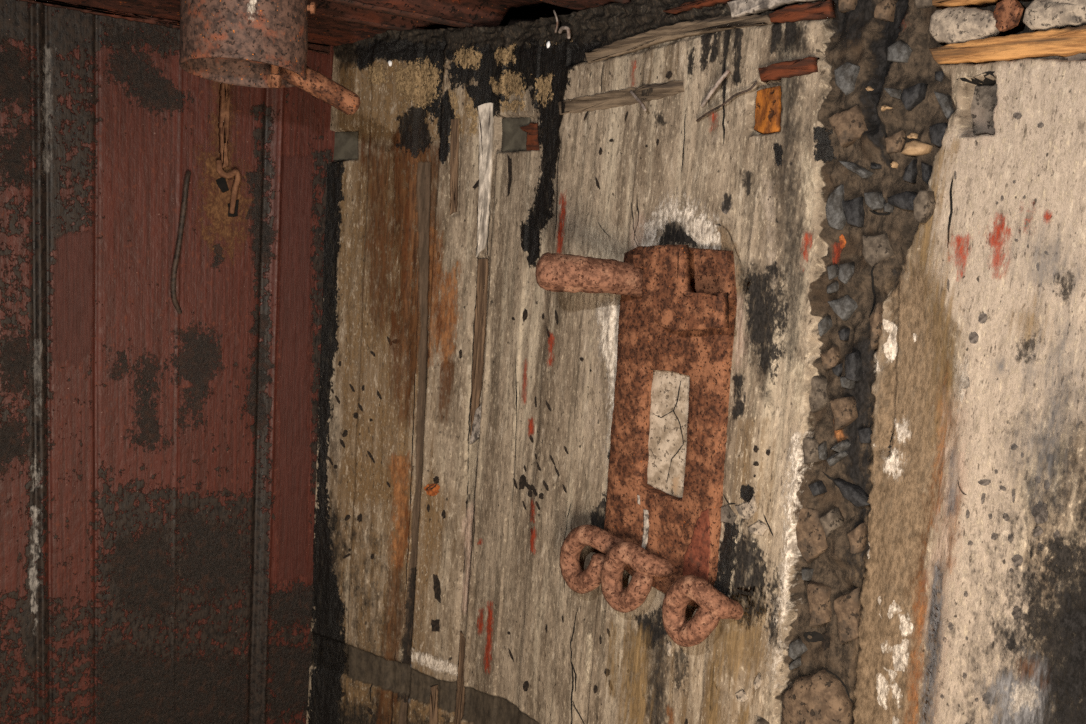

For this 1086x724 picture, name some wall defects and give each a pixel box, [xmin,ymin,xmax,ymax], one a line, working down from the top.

water stain [28,506,40,628]
water stain [43,48,52,136]
water stain [306,160,348,724]
water stain [354,34,608,268]
water stain [609,606,689,724]
water stain [706,362,812,724]
water stain [737,78,837,381]
spalling [757,0,956,724]